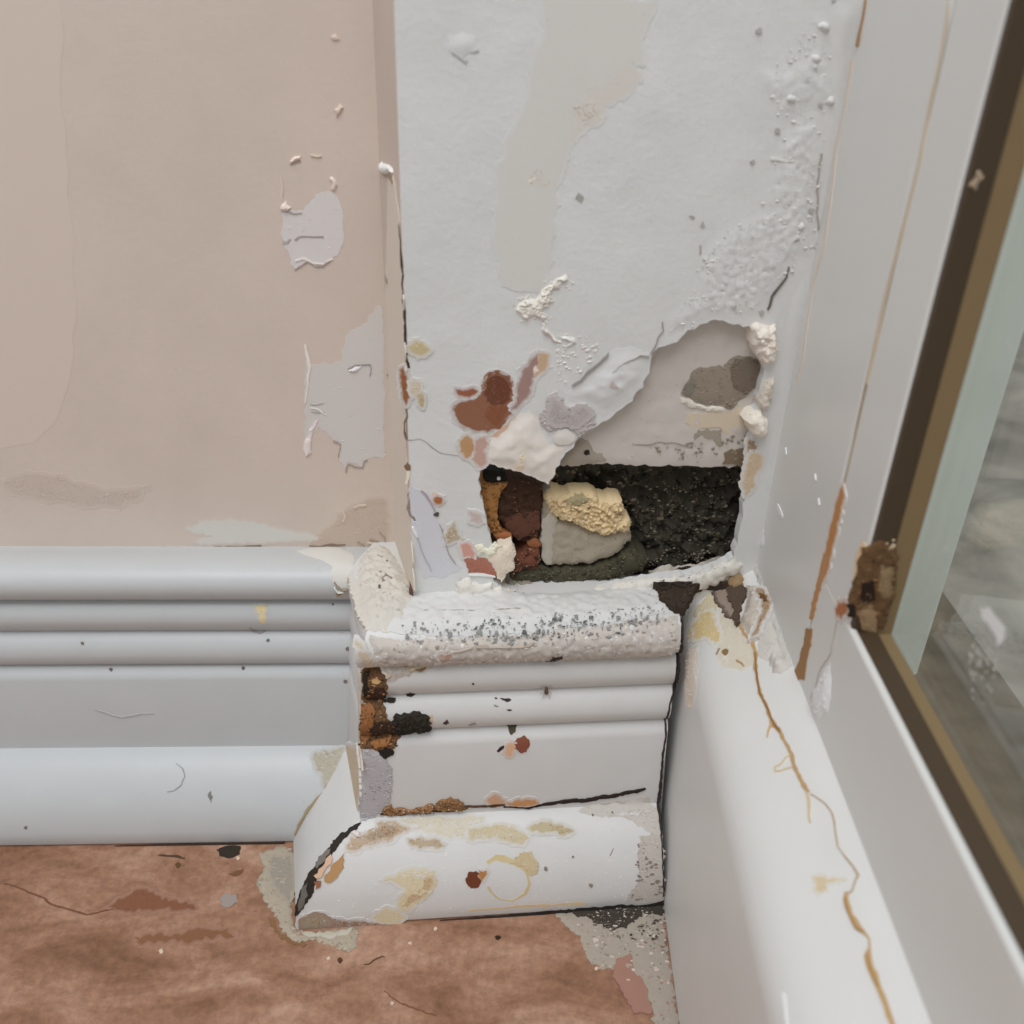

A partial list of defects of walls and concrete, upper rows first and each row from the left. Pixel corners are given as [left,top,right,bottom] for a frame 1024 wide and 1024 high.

peeling [280,176,345,270]
crack [398,225,410,368]
peeling [302,306,386,472]
spalling [681,355,761,410]
peeling [404,462,533,585]
flaking render [488,411,741,575]
corrosion [794,481,849,681]
peeling [350,749,393,838]
peeling [465,867,490,888]
peeling [497,725,530,759]
crack [380,615,684,897]
crack [739,621,895,1024]